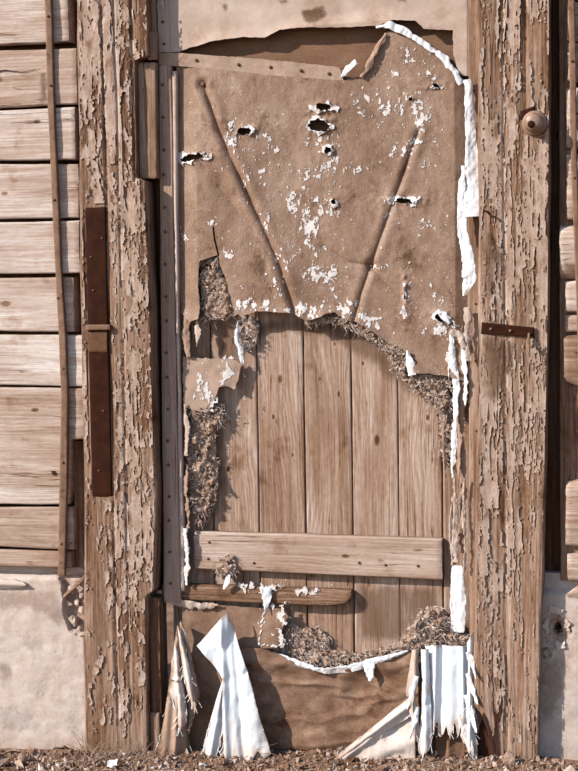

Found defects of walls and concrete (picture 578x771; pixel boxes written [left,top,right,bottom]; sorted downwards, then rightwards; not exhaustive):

peeling [77,0,154,739]
peeling [475,0,572,743]
spalling [58,567,93,636]
peeling [237,579,286,599]
peeling [295,586,320,596]